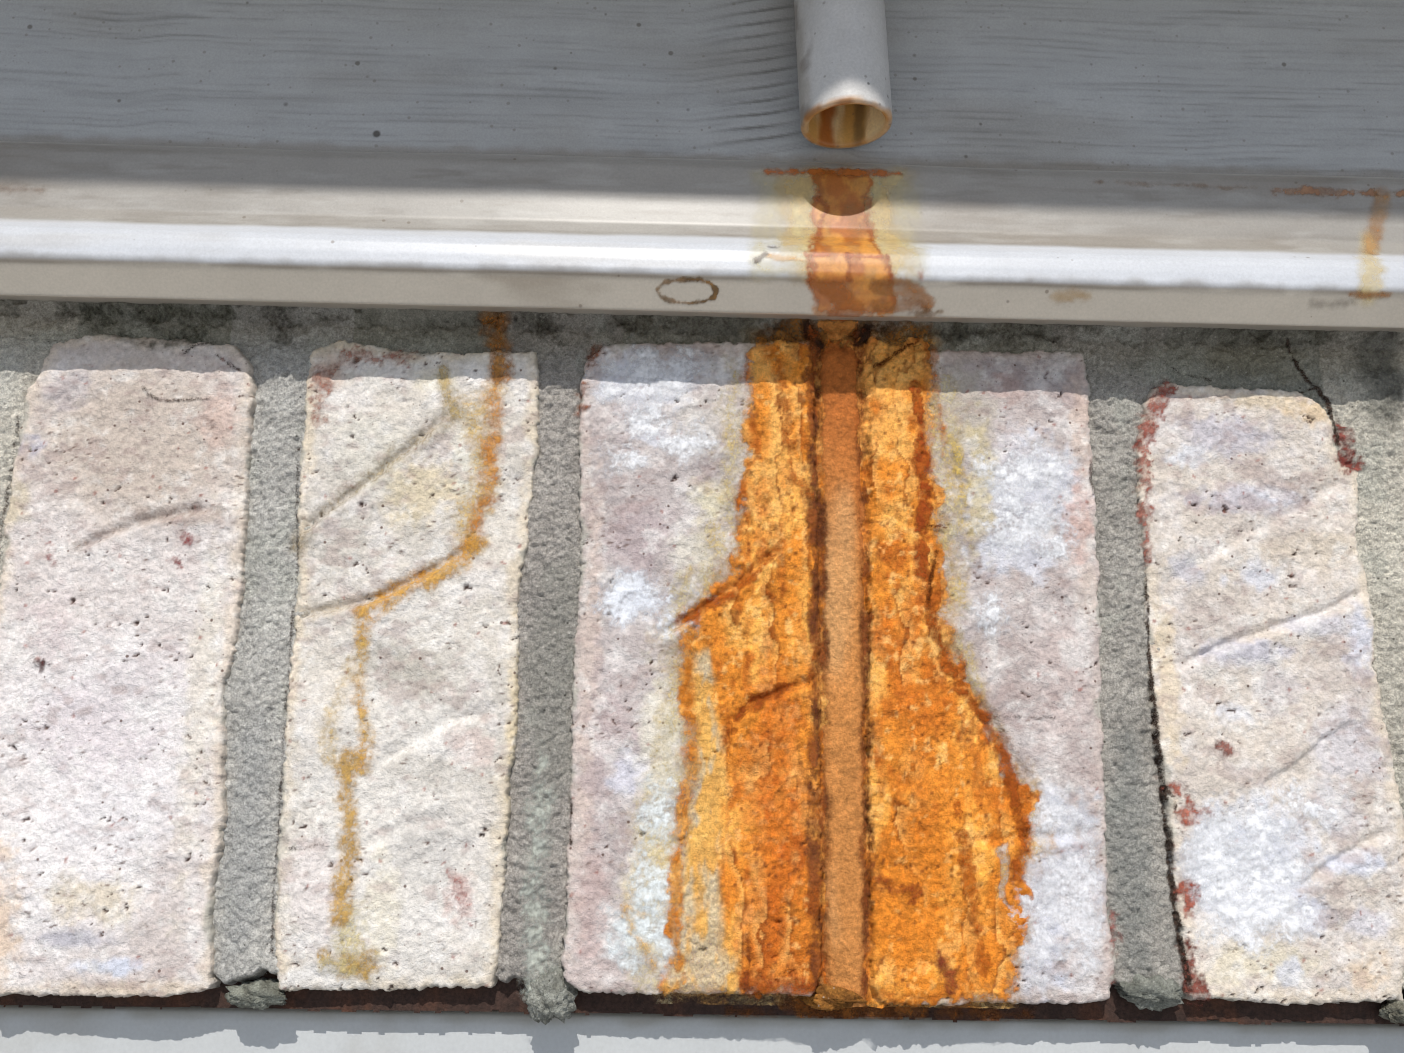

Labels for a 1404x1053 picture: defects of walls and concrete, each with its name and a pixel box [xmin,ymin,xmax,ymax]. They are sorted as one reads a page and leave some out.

rust [1283,185,1404,298]
rust [356,312,511,667]
rust [624,168,1042,1020]
crack [1286,339,1340,446]
rust [317,685,377,980]